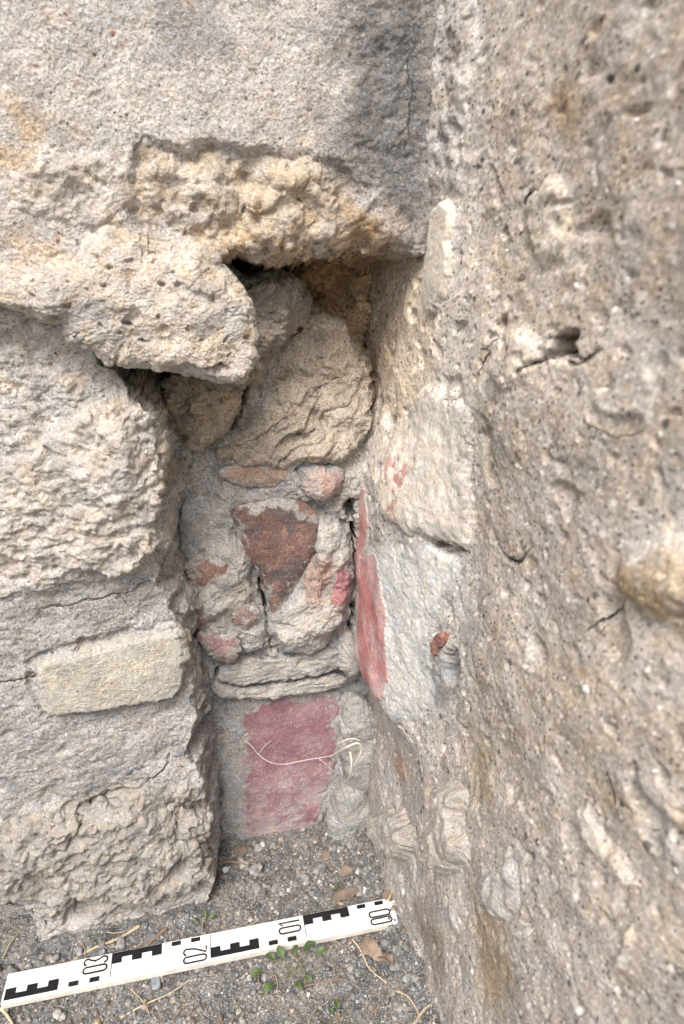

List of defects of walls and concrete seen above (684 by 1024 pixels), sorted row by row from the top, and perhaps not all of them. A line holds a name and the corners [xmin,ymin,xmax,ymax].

crack [405,63,416,149]
crack [516,350,599,371]
crack [44,581,151,609]
flaking render [349,385,472,725]